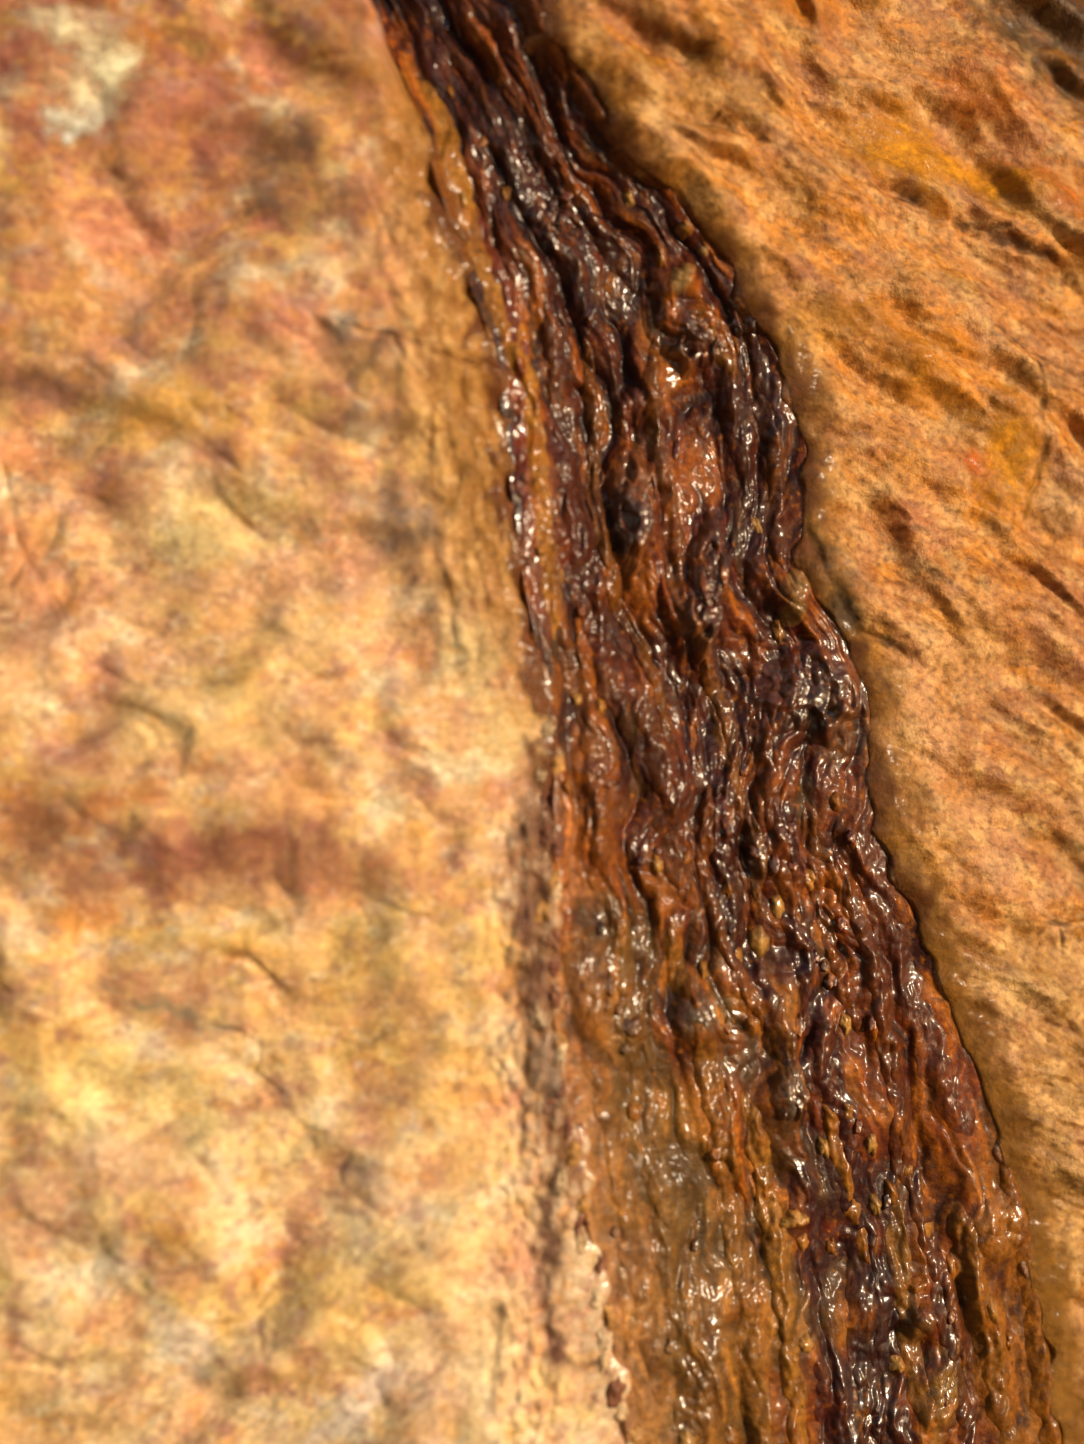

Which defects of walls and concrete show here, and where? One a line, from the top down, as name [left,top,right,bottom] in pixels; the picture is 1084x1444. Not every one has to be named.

corrosion [104,828,230,890]
corrosion [370,0,1083,1444]